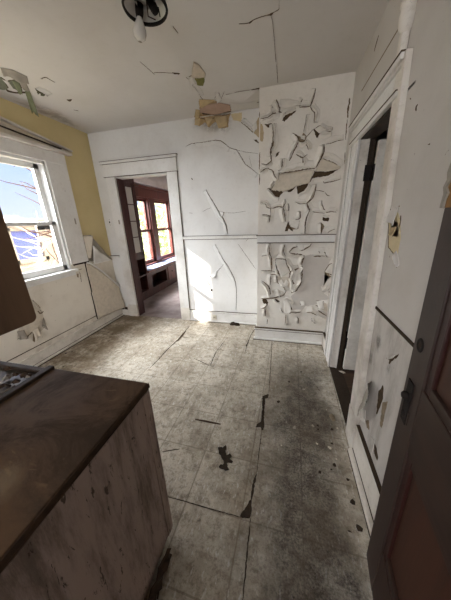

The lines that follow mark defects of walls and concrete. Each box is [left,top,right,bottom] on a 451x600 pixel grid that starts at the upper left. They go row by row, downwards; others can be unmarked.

crack [241,9,279,60]
flaking render [0,68,52,117]
peeling [189,62,206,86]
crack [187,140,260,185]
peeling [194,88,344,234]
crack [203,190,244,303]
peeling [386,205,401,268]
peeling [260,243,333,325]
flaking render [17,299,48,342]
peeling [357,381,378,460]
peeling [376,385,388,428]